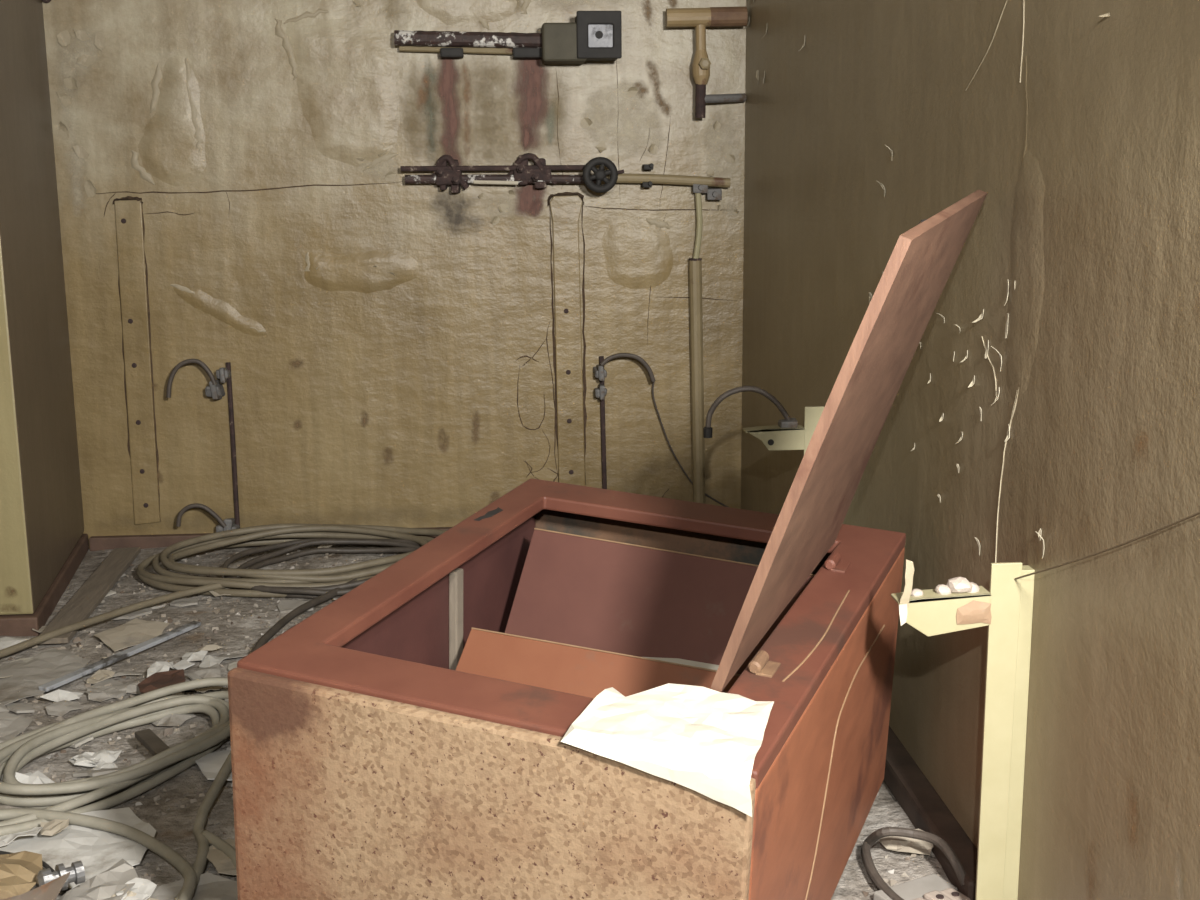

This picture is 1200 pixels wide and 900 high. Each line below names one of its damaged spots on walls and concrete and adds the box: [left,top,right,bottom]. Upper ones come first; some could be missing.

crack [965,0,1024,91]
rust [419,58,468,164]
rust [517,59,547,149]
rust [517,184,544,216]